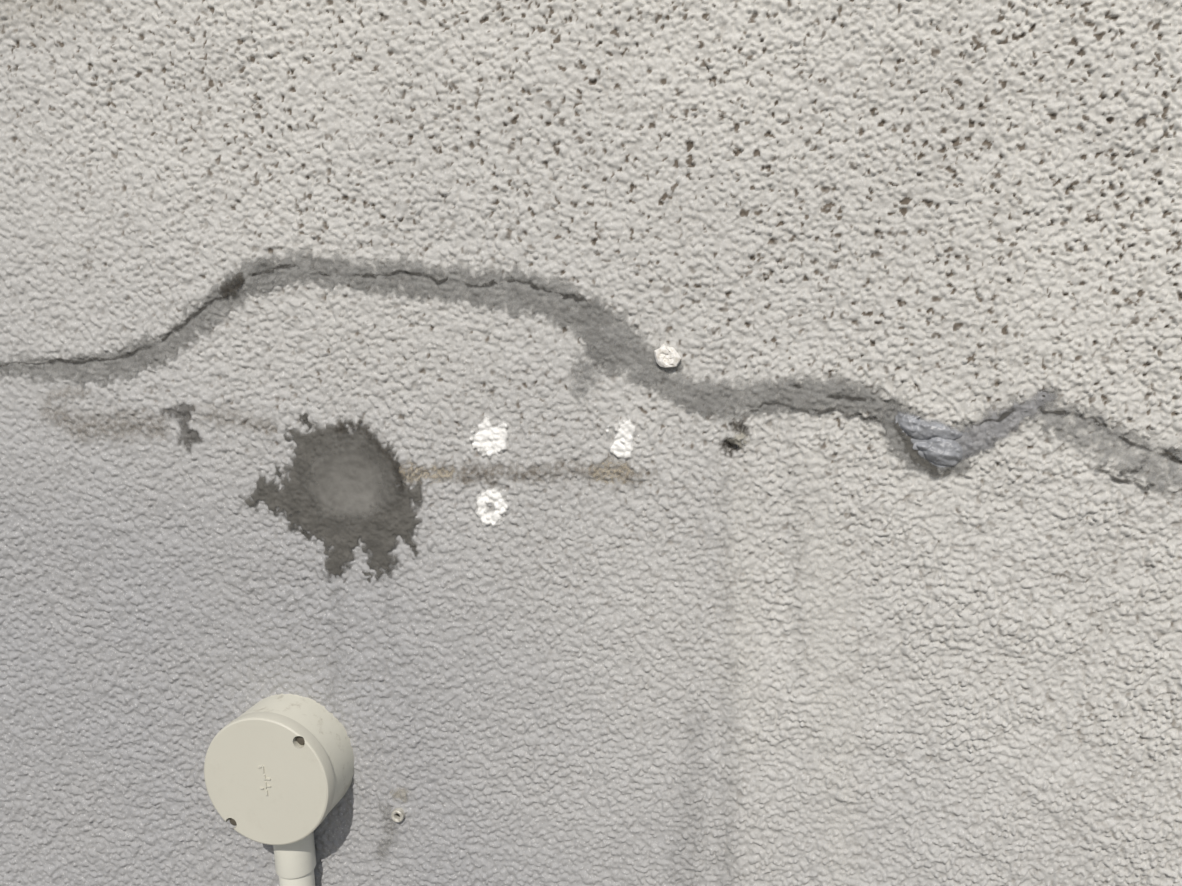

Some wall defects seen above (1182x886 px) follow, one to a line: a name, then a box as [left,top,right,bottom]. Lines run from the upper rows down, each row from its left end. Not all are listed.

crack [0,250,923,427]
crack [958,388,1182,495]